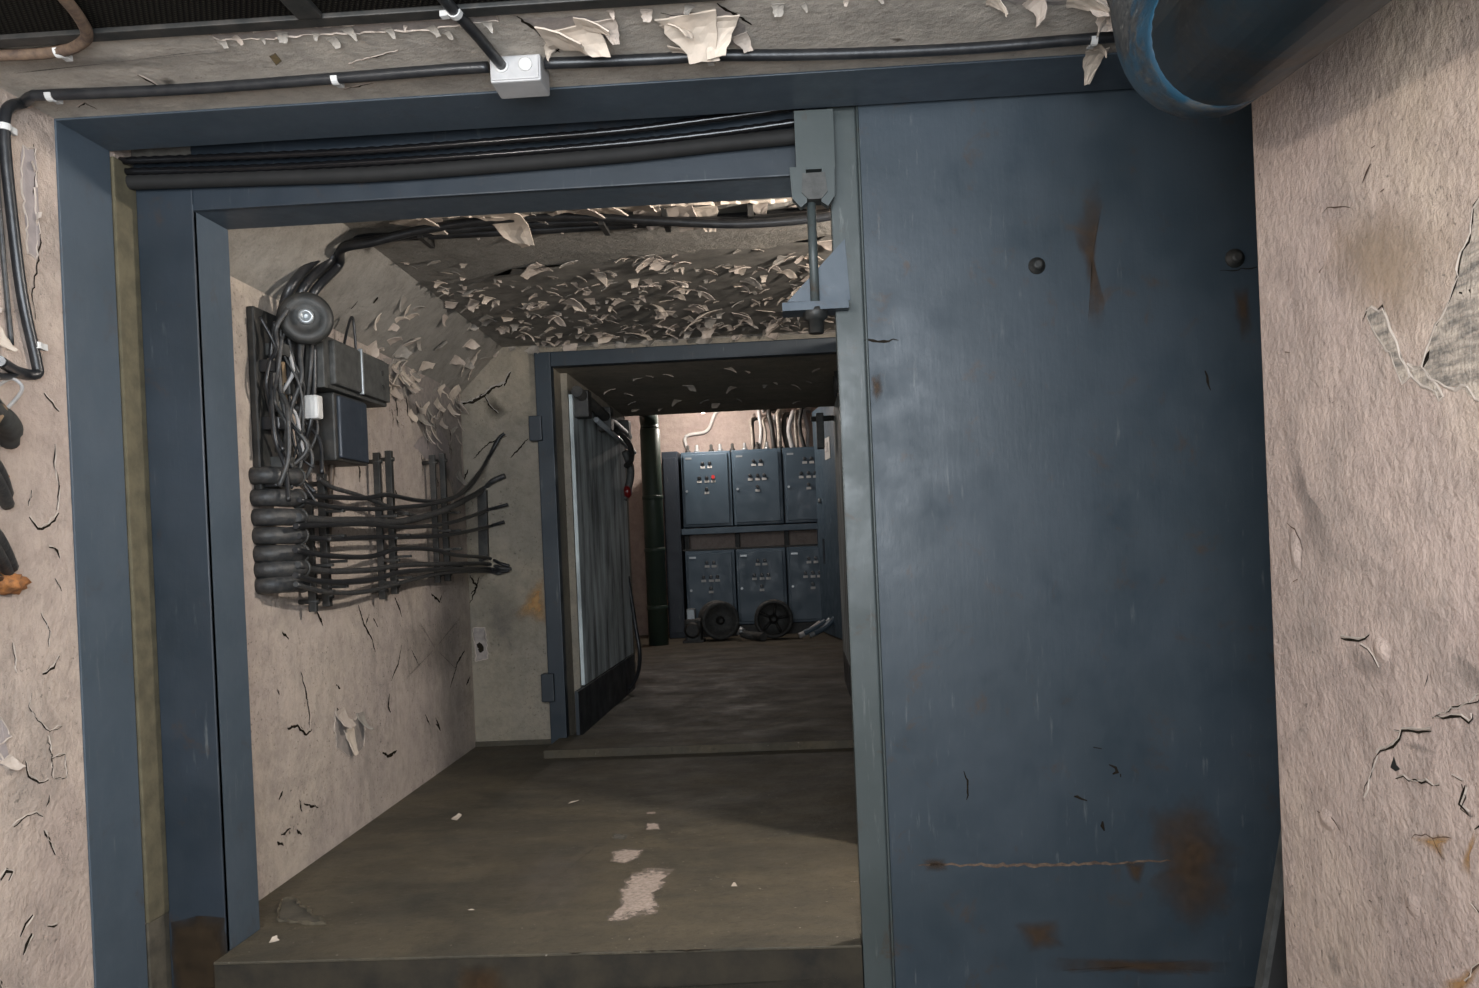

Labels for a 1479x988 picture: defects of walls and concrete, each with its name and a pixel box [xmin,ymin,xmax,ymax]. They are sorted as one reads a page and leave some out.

peeling [208,10,620,61]
peeling [640,3,753,64]
peeling [986,0,1117,86]
peeling [20,144,42,319]
peeling [0,308,18,352]
peeling [365,197,836,503]
peeling [1362,197,1479,402]
crack [1340,634,1379,668]
spalling [334,707,375,758]
crack [1363,676,1479,860]
rust [919,859,1171,877]
crack [1464,962,1479,982]